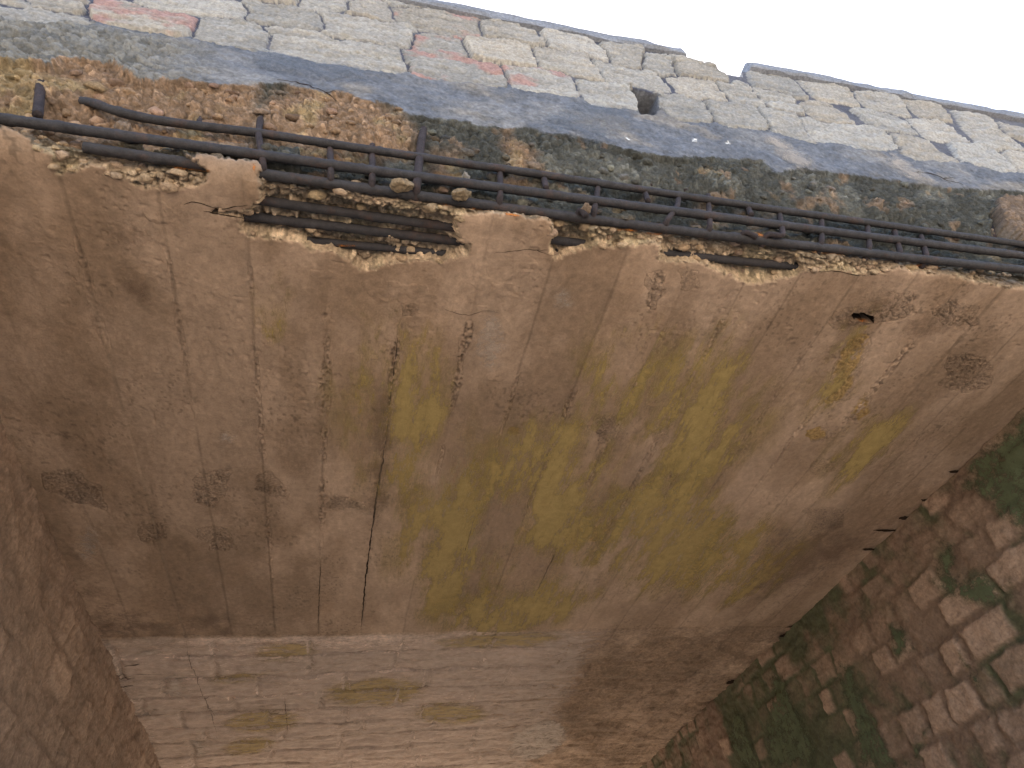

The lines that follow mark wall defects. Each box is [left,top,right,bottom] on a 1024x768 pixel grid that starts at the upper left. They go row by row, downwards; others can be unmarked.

crack [186,201,250,220]
spalling [0,54,1024,290]
crack [361,339,398,625]
damp [345,319,805,648]